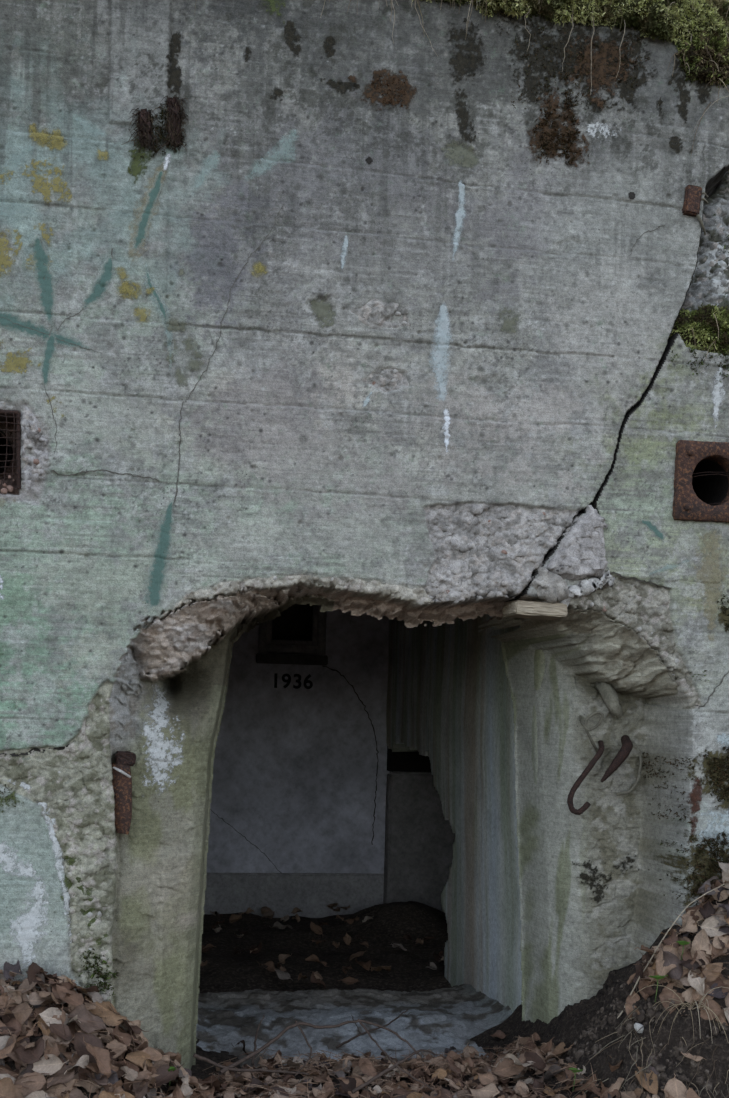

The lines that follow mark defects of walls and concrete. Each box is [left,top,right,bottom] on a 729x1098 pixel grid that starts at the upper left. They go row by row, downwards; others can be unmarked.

water stain [166,32,182,99]
water stain [495,13,657,167]
water stain [669,136,683,153]
water stain [668,53,712,123]
water stain [453,181,465,253]
spalling [681,171,729,313]
water stain [432,304,451,452]
crack [505,166,729,602]
spalling [161,503,581,618]
spalling [569,575,702,709]
spalling [0,681,118,1003]